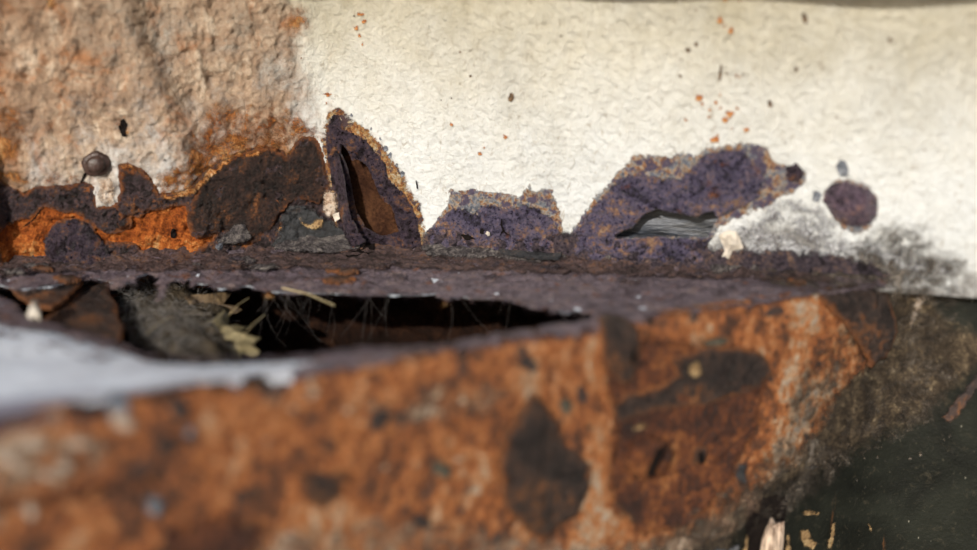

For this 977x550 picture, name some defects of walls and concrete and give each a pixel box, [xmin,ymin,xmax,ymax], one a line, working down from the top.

peeling [27,300,41,321]
corrosion [0,93,898,550]